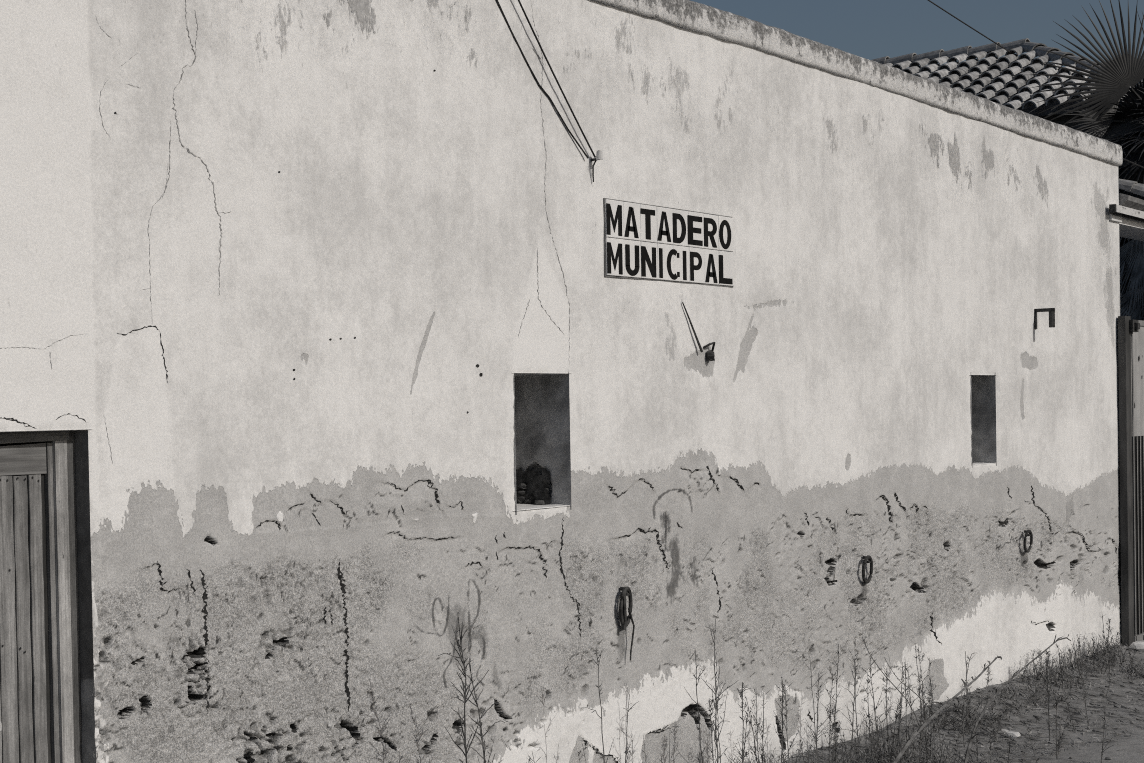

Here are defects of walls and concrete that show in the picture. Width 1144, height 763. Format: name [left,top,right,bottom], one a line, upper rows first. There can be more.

crack [118,3,230,383]
crack [0,413,113,463]
crack [387,479,464,541]
crack [609,478,654,497]
crack [681,466,759,490]
crack [805,493,928,530]
crack [145,563,211,714]
crack [323,559,351,712]
crack [467,517,582,636]
peeling [91,450,1121,763]